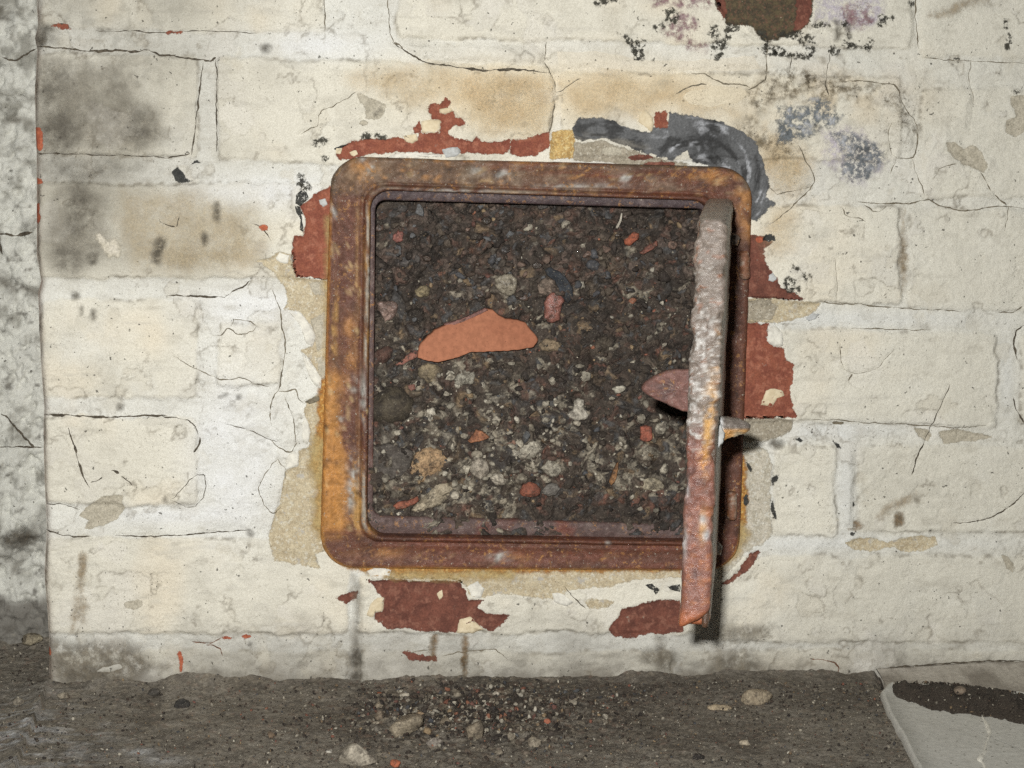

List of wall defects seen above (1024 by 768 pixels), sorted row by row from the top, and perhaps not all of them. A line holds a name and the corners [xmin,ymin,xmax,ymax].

crack [387,0,581,133]
mould [624,35,654,62]
mould [708,23,740,61]
mould [757,21,873,60]
spalling [334,93,688,166]
crack [44,414,206,510]
crack [168,281,302,514]
peeling [255,186,331,568]
rust [309,379,325,533]
rust [732,456,748,558]
spalling [717,234,821,585]
spalling [363,568,683,638]